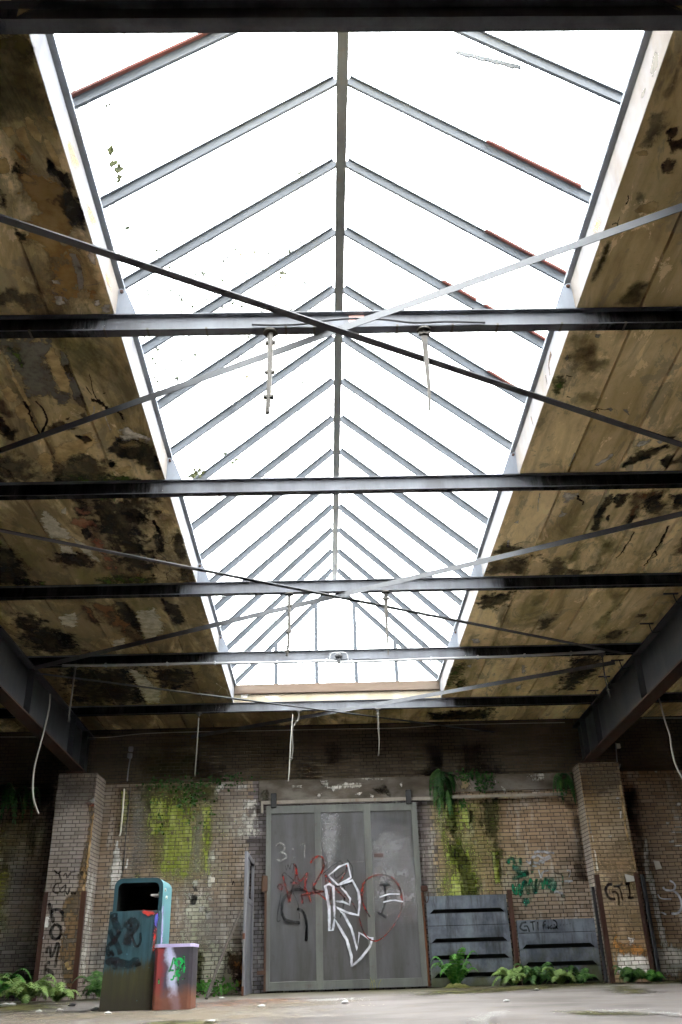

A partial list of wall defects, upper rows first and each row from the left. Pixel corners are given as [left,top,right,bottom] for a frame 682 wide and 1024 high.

leakage [642,113,682,174]
leakage [0,149,110,313]
crack [86,374,124,420]
leakage [0,543,32,586]
peeling [40,507,100,562]
leakage [48,551,95,568]
leakage [70,497,194,582]
leakage [590,493,630,531]
crack [616,526,669,566]
leakage [628,492,682,524]